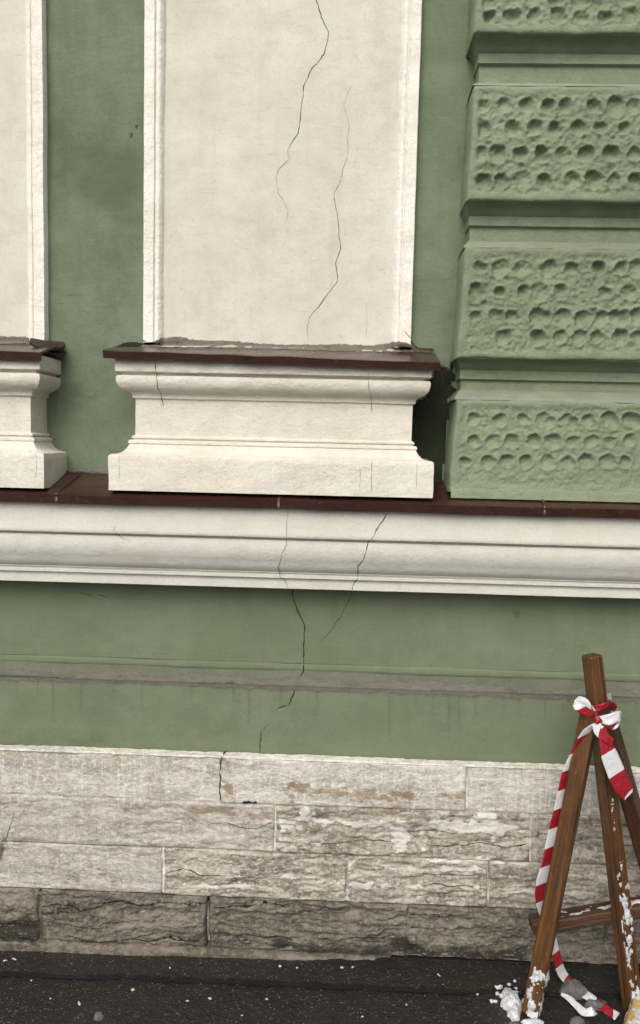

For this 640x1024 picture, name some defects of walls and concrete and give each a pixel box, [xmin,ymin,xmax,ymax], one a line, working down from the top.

crack [259,514,387,755]
crack [212,751,272,829]